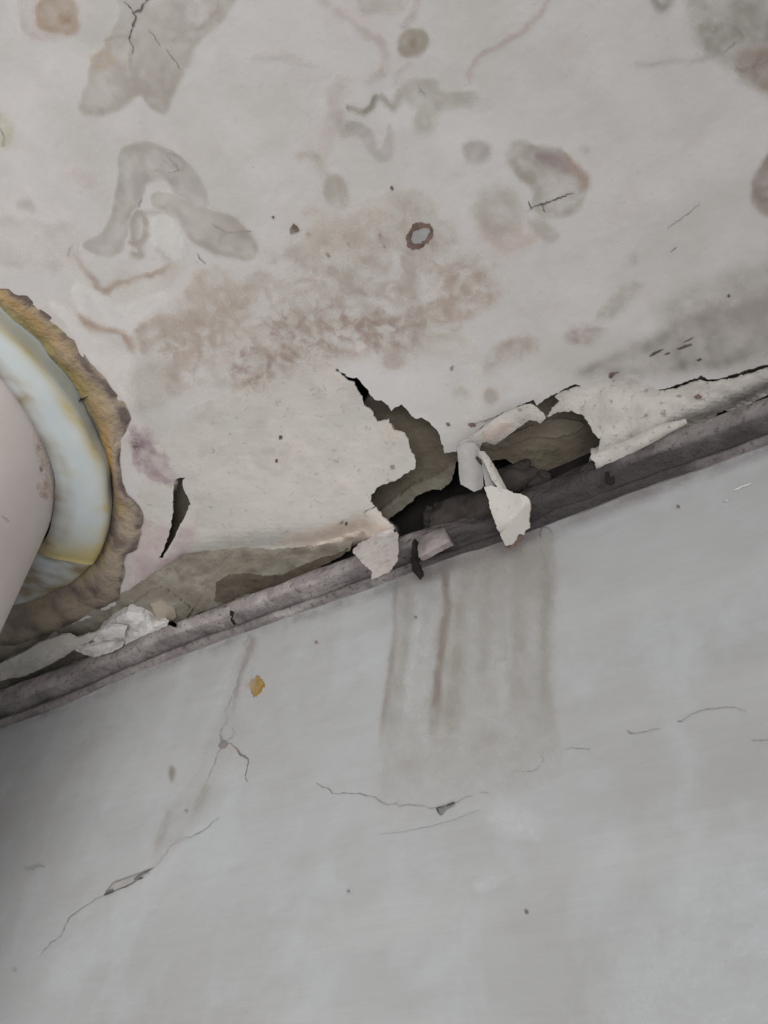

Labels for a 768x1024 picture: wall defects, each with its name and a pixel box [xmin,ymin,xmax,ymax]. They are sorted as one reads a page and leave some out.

damp [78,0,234,116]
damp [53,141,493,412]
damp [476,141,588,250]
peeling [0,365,416,690]
peeling [457,367,768,549]
damp [394,560,550,755]
crack [316,783,487,830]